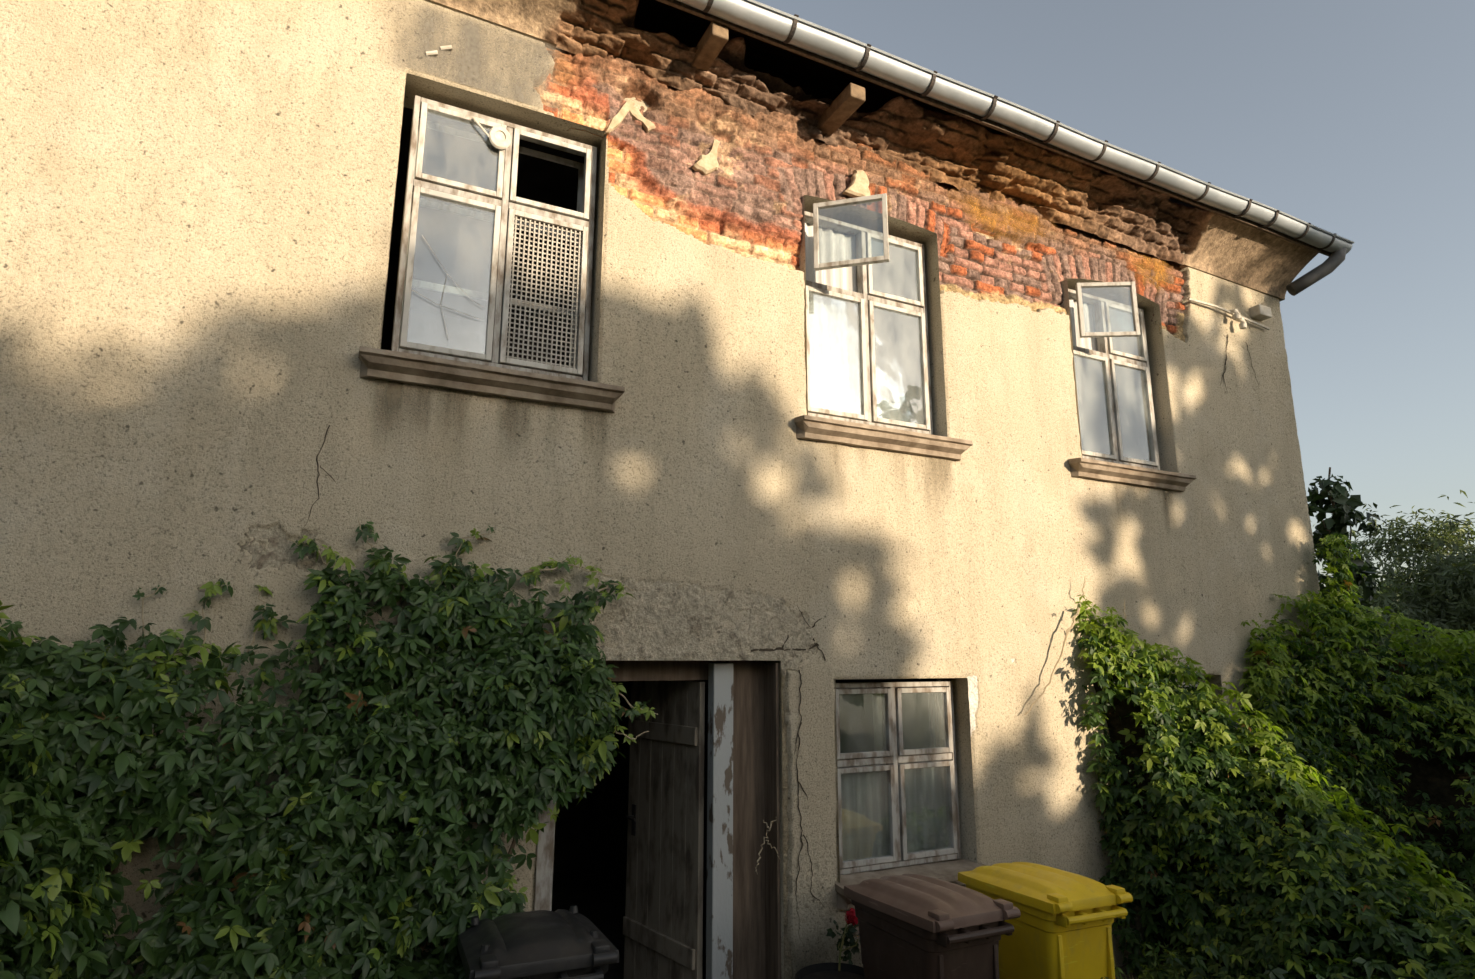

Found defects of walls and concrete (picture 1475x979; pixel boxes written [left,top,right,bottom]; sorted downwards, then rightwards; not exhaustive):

spalling [533,47,1186,342]
crack [303,425,335,529]
spalling [529,573,817,979]